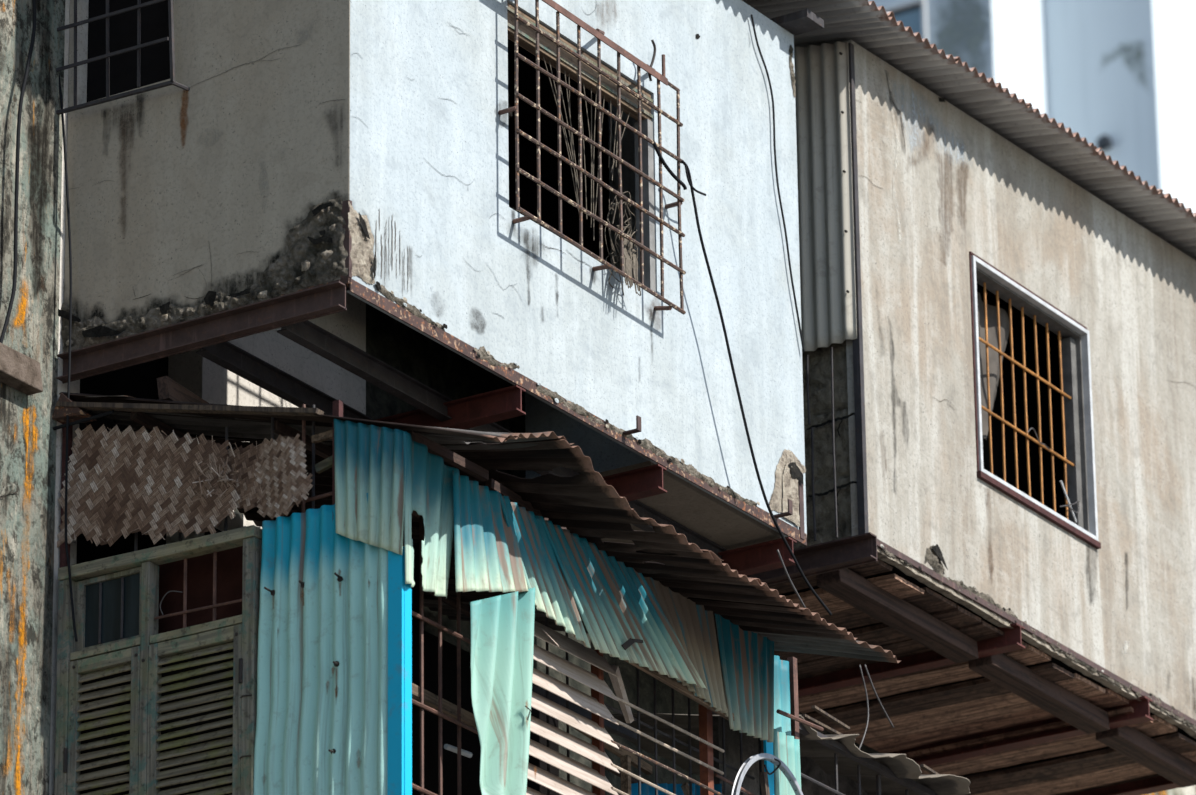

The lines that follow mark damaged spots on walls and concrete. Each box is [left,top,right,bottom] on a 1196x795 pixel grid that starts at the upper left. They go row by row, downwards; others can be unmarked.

corrosion [180,91,188,144]
flaking render [58,198,447,352]